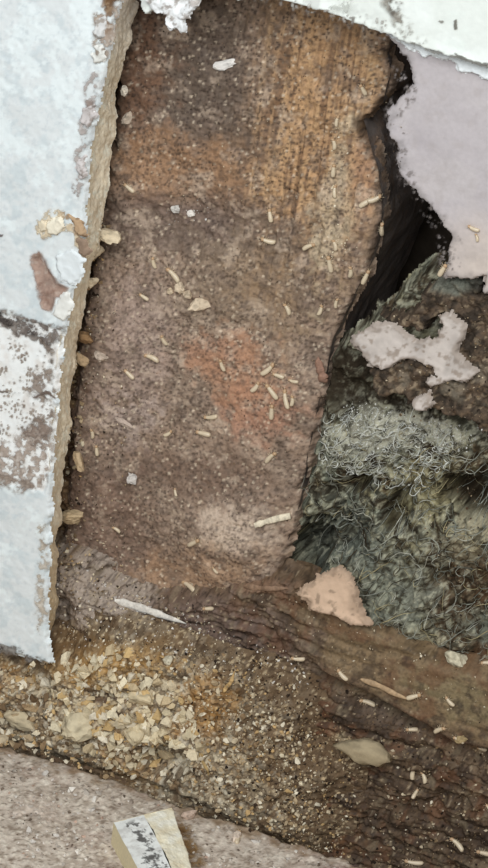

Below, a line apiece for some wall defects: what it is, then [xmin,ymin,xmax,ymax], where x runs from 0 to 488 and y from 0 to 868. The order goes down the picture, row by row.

flaking render [72,0,126,197]
flaking render [213,58,236,71]
peeling [30,210,93,321]
mould [0,310,63,493]